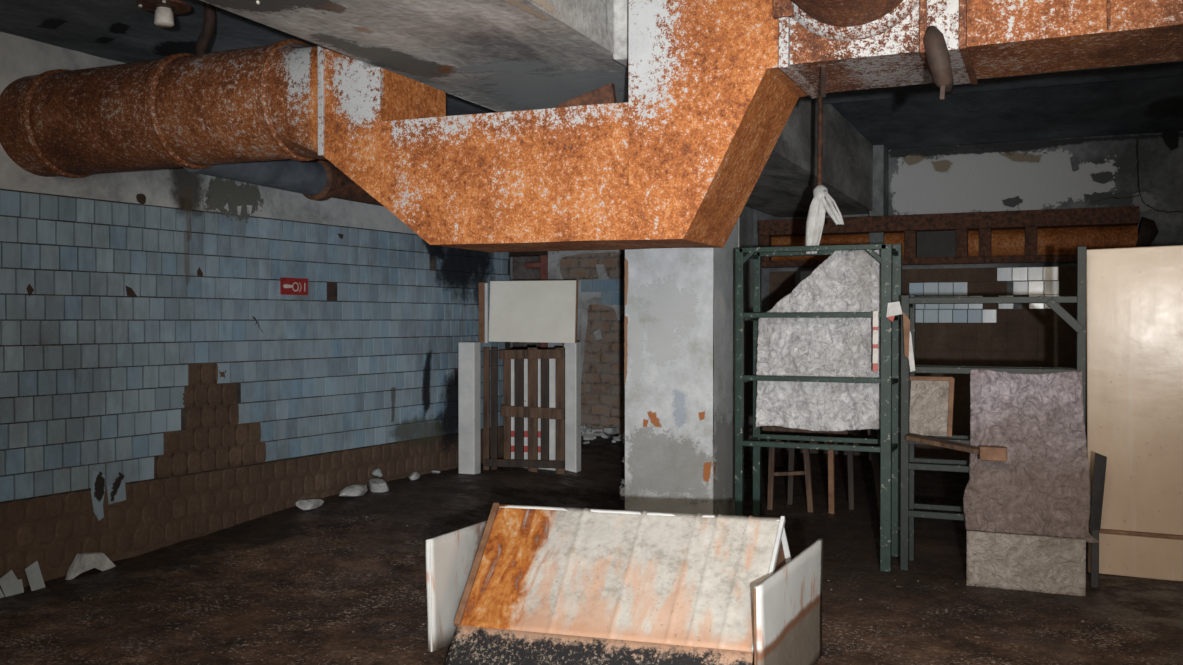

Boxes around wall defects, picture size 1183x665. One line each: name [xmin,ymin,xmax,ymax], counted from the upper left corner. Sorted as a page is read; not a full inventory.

corrosion [329,167,383,206]
peeling [889,145,1118,215]
water stain [423,240,445,258]
peeling [481,426,504,463]
peeling [0,362,459,598]